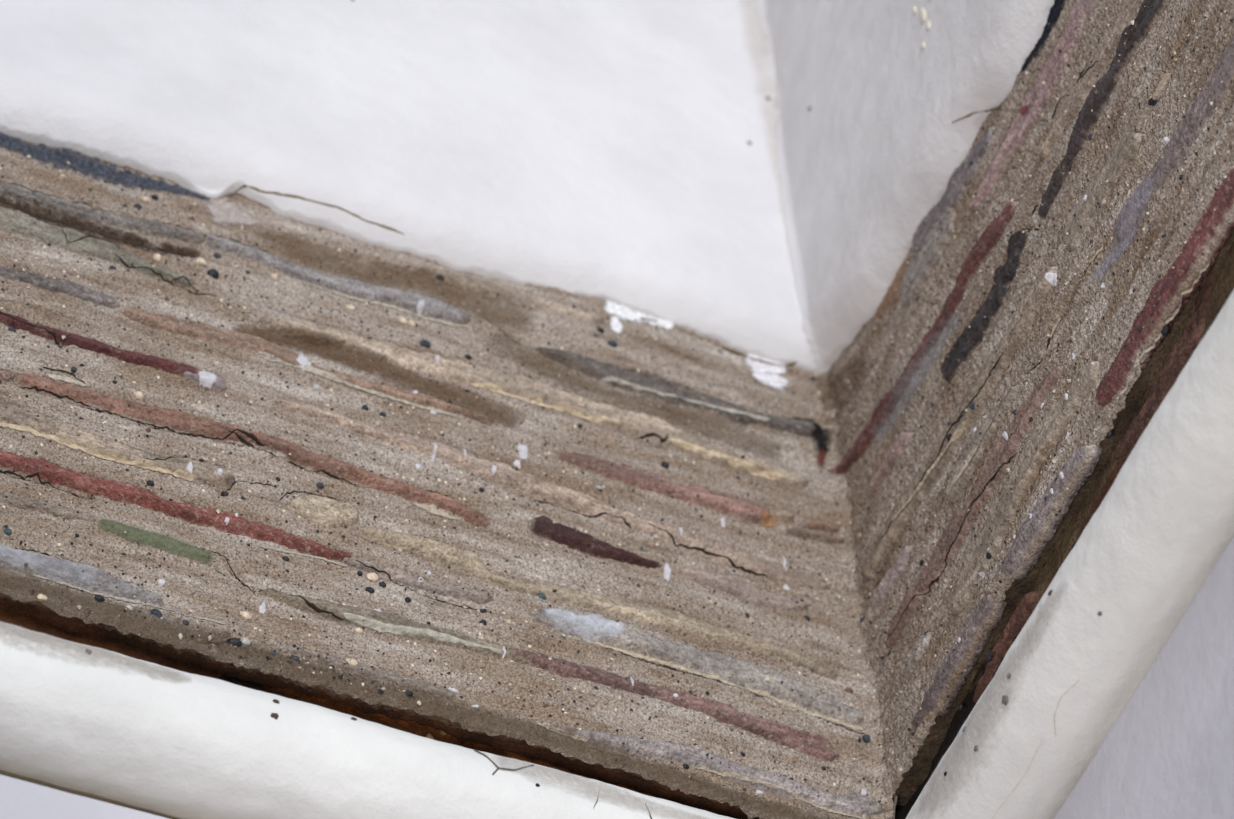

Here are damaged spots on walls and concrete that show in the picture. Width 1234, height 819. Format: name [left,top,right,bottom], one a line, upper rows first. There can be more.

spalling [206,197,258,226]
crack [229,184,404,235]
leakage [0,544,226,624]
leakage [344,613,504,654]